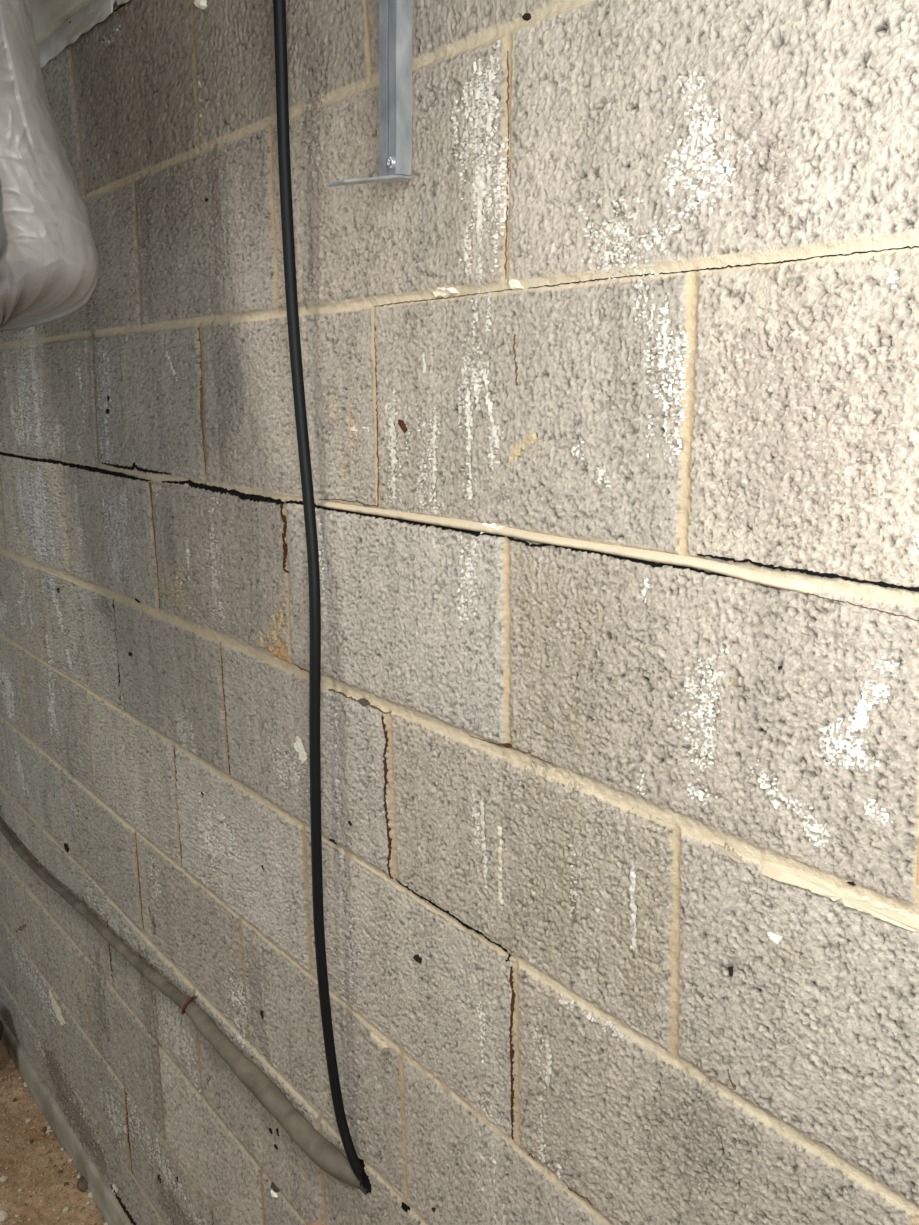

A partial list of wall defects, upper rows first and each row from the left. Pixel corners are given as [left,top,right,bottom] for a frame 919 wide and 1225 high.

crack [0,51,919,621]
crack [294,664,536,1159]
crack [471,736,553,765]
crack [567,1185,592,1205]